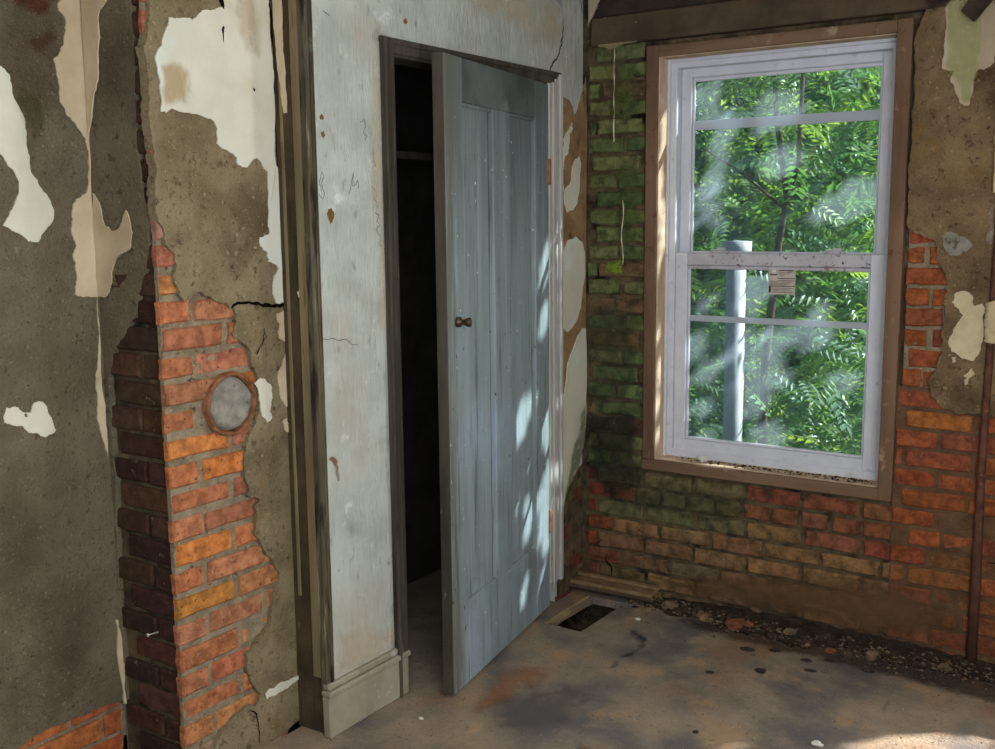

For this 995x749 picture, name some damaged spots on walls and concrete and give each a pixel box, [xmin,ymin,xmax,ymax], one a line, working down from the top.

peeling [942,0,995,106]
peeling [0,66,54,242]
peeling [3,401,56,437]
spalling [19,0,299,749]
crack [232,301,284,354]
water stain [566,411,640,500]
spalling [555,41,995,664]